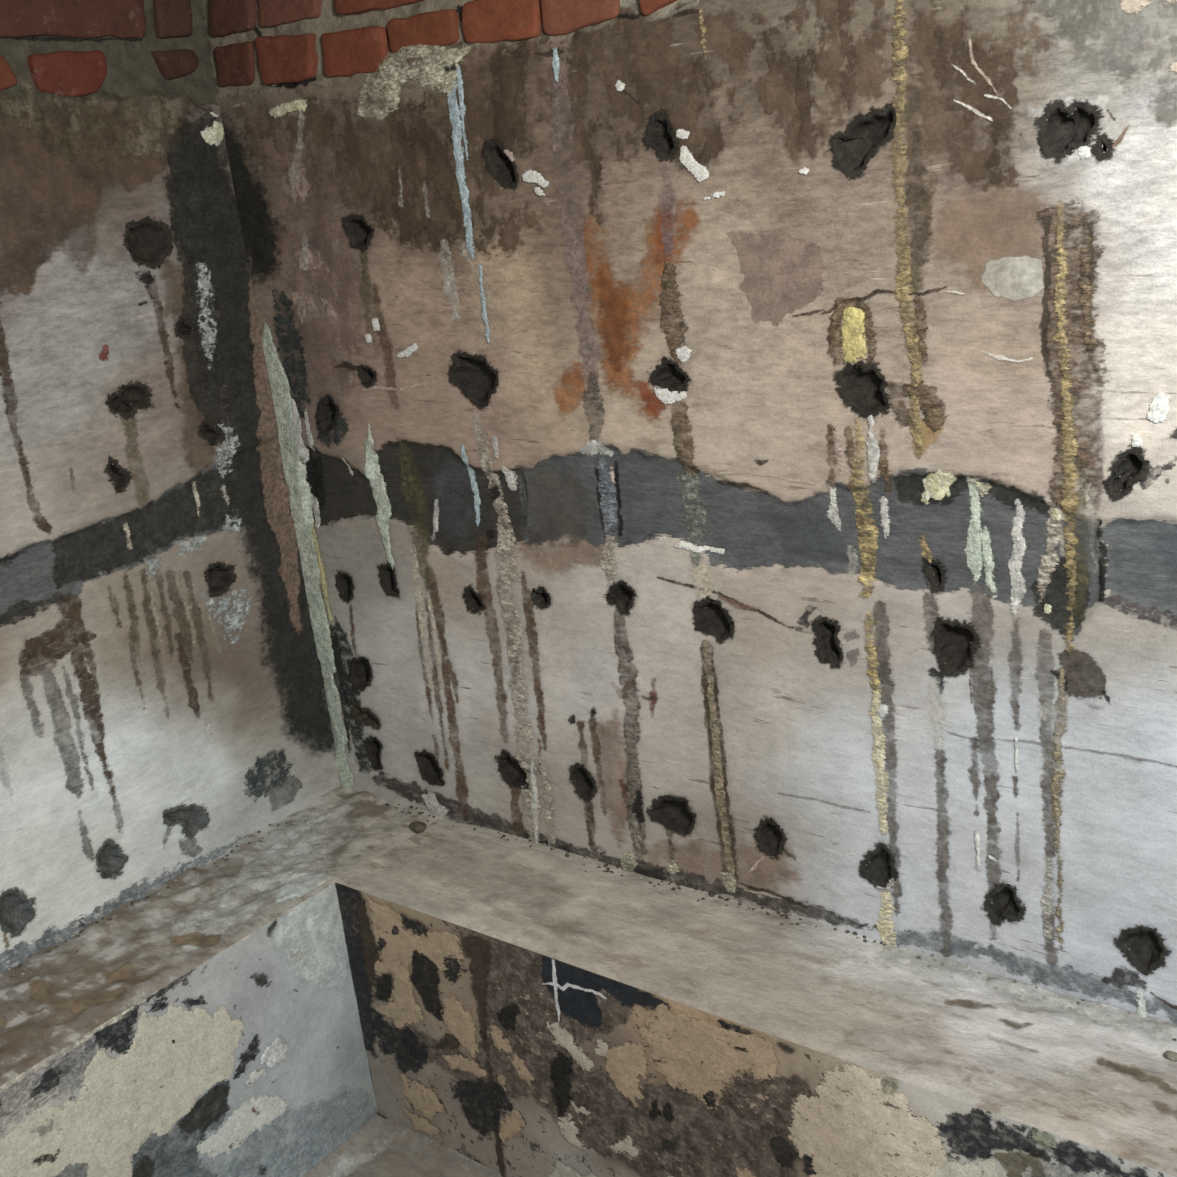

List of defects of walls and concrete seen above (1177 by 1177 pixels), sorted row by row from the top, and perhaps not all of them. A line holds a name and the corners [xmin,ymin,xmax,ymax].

rust [555,363,585,412]
rust [582,202,698,420]
damp [749,0,1160,651]
damp [372,165,1177,1041]
damp [0,835,243,973]
damp [0,963,207,1135]
peeling [0,1005,244,1177]
peeling [196,1067,290,1159]
peeling [366,896,534,1092]
peeling [547,1002,794,1109]
peeling [788,1063,1000,1177]
damp [1097,1058,1177,1112]